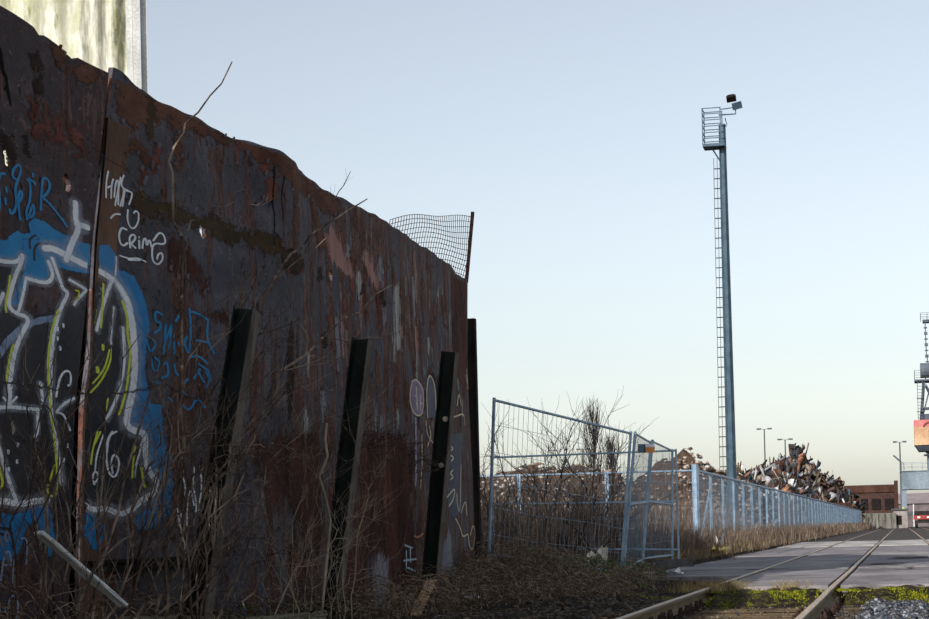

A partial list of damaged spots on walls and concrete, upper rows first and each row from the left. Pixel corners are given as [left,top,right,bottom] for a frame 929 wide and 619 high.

rust [62,57,102,84]
rust [128,162,330,275]
rust [326,229,468,611]